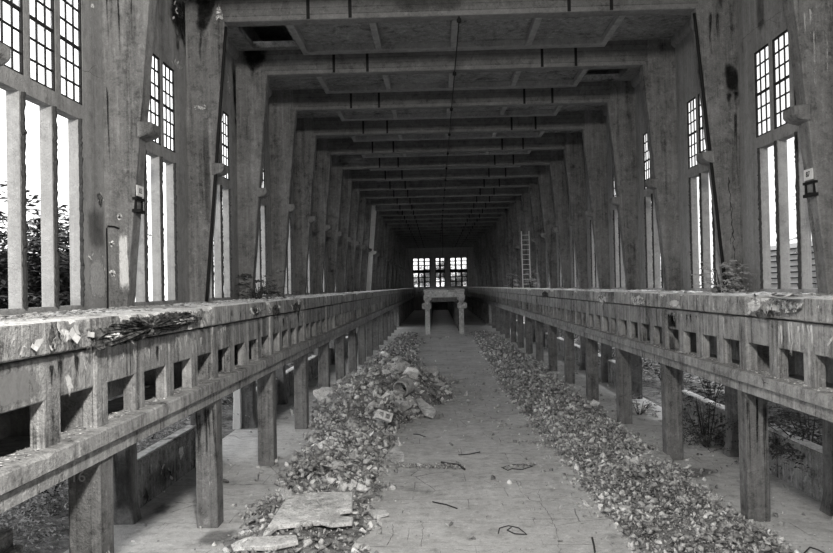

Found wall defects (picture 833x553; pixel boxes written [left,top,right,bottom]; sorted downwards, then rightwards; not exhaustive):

leakage [725,65,738,101]
spalling [747,292,802,318]
spalling [49,311,202,353]